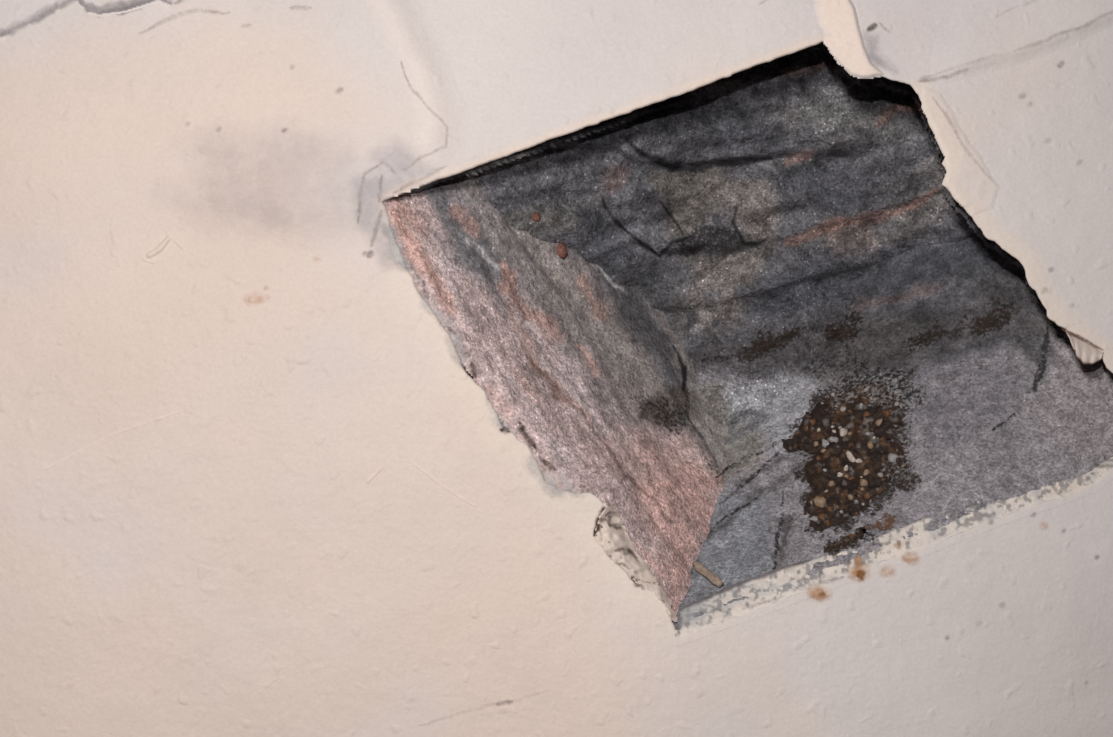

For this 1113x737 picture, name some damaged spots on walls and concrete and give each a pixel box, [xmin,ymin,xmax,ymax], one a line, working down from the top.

crack [79,0,171,19]
peeling [921,86,1000,215]
peeling [1063,329,1104,365]
spalling [499,421,571,494]
spalling [591,457,1113,646]